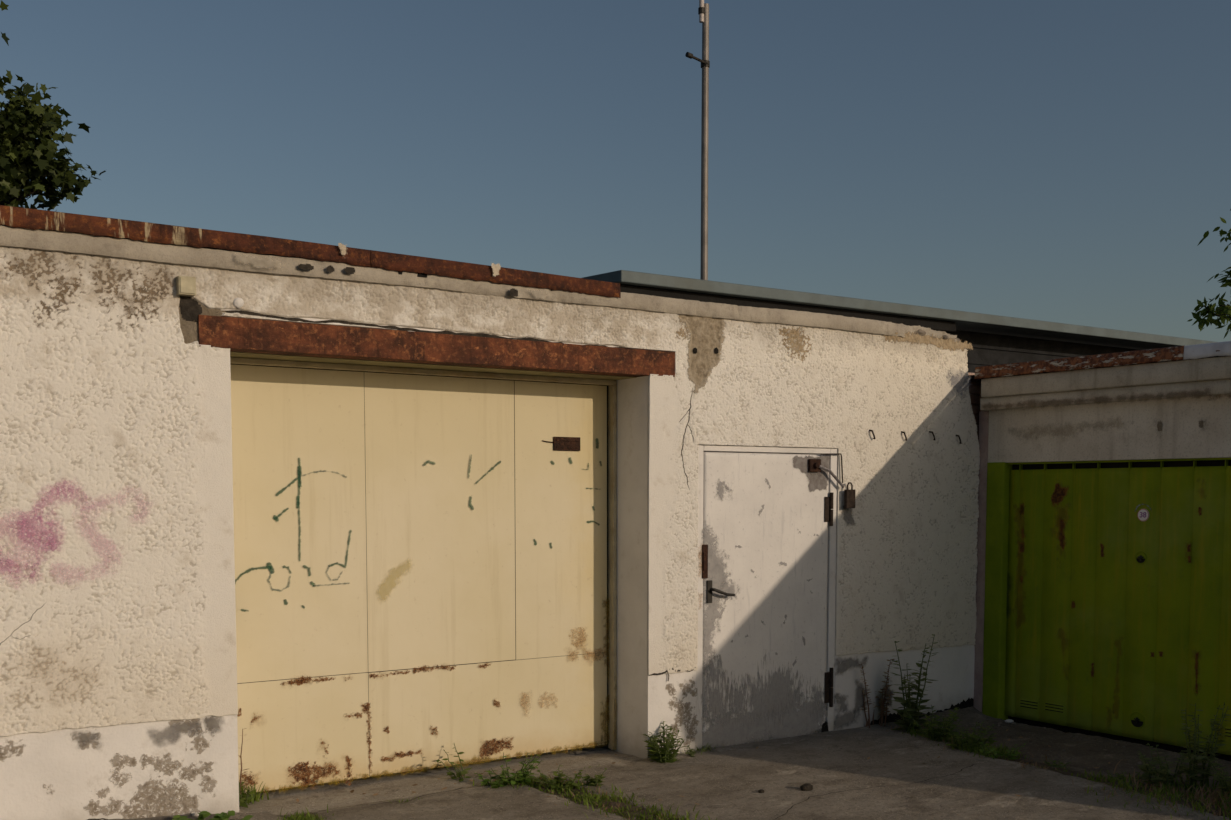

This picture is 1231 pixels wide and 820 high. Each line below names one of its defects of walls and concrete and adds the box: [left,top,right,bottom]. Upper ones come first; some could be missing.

flaking render [676,315,726,393]
flaking render [779,326,812,361]
crack [679,388,694,490]
peeling [665,526,835,748]
rust [280,676,346,686]
rust [370,665,456,678]
peeling [0,740,24,760]
peeling [70,732,100,750]
peeling [84,716,218,819]
rust [288,742,353,789]
rust [346,703,421,772]
rust [480,738,513,759]